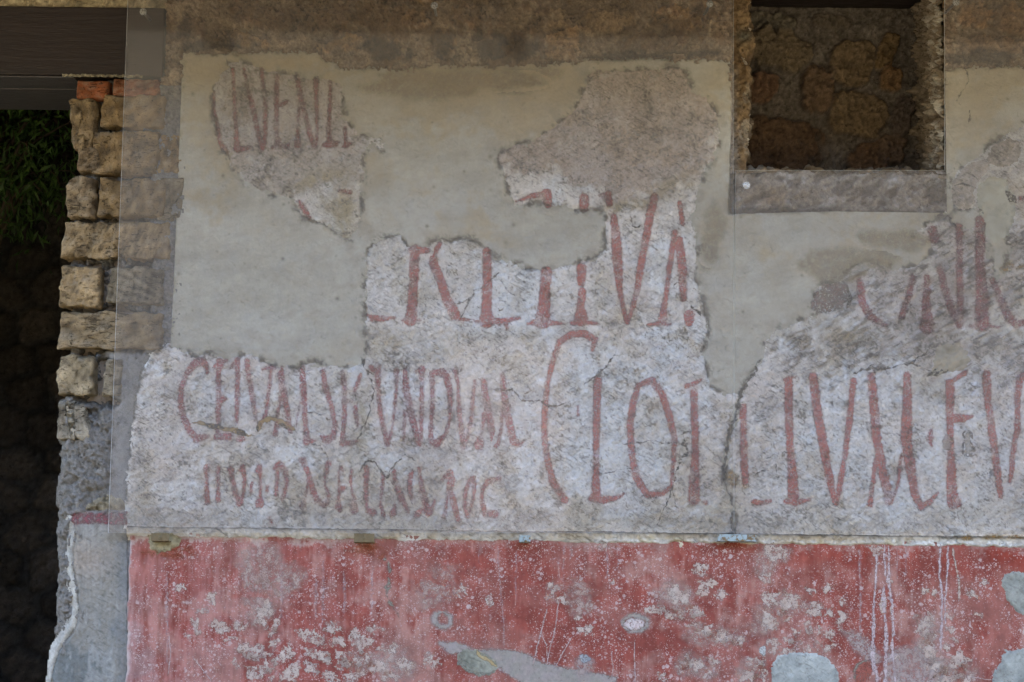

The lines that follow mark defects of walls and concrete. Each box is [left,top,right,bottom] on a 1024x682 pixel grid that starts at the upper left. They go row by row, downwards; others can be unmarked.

crack [503,389,562,407]
crack [588,358,613,382]
crack [722,360,761,520]
spalling [187,546,617,682]
spalling [738,542,975,682]
damp [869,544,900,682]
damp [938,545,961,650]
spalling [966,571,1024,618]
peeling [657,654,721,682]